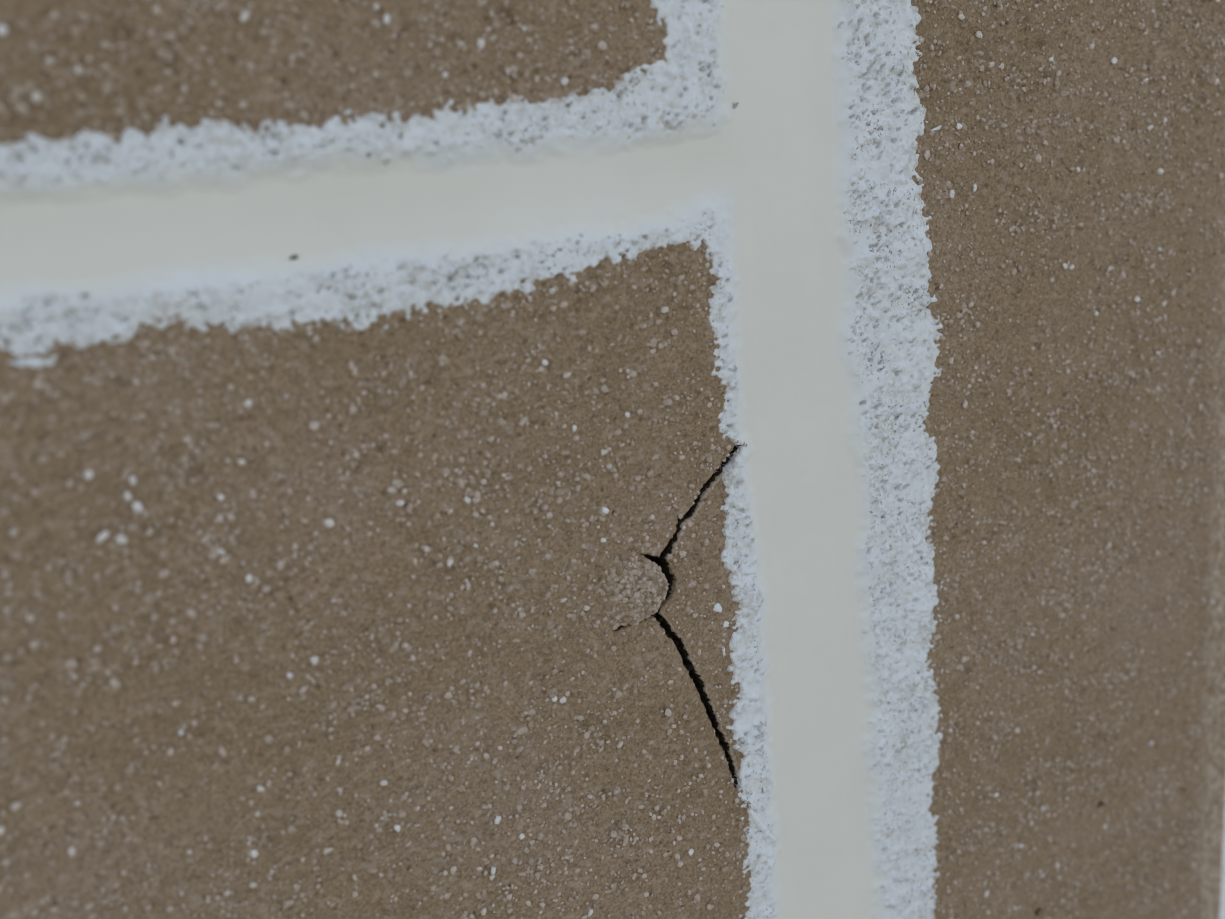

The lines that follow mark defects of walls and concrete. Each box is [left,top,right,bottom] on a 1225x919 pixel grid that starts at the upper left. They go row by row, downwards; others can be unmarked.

crack [614,445,744,788]